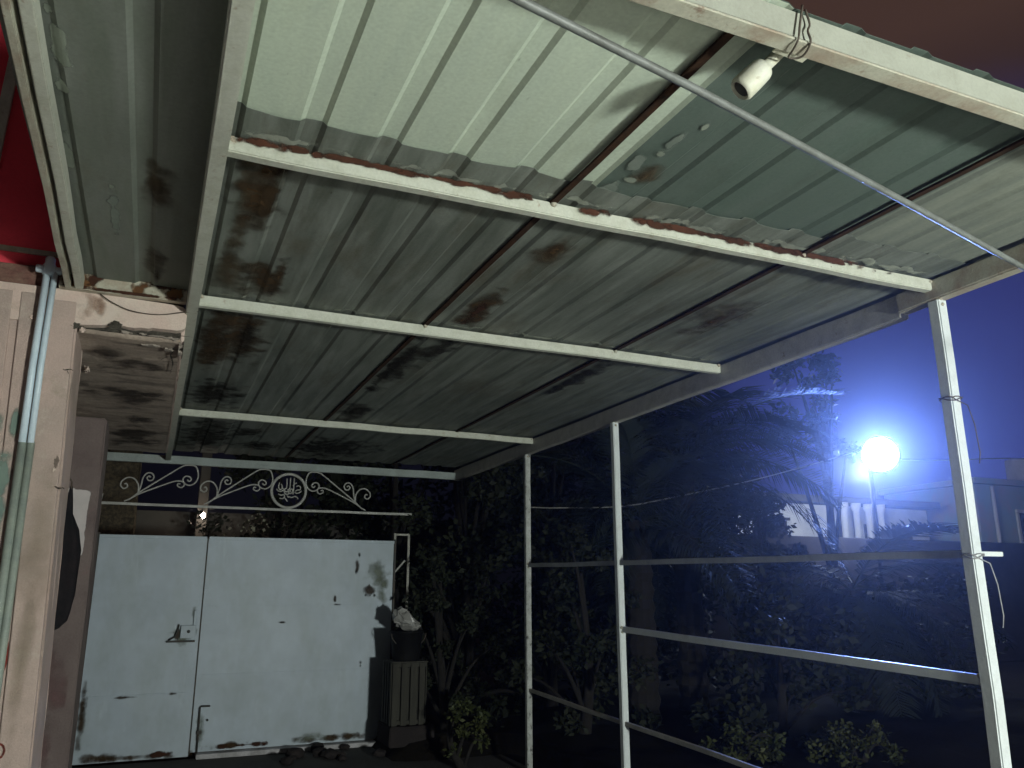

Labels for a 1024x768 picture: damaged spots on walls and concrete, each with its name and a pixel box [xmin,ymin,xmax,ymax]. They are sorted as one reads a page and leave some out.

rust [237,137,533,201]
peeling [599,134,685,192]
rust [217,160,292,294]
rust [580,208,611,217]
rust [632,218,891,274]
rust [58,253,186,313]
rust [455,293,503,324]
leakage [93,349,164,371]
leakage [85,387,162,405]
leakage [113,418,167,445]
leakage [374,565,387,600]
rust [216,741,268,749]